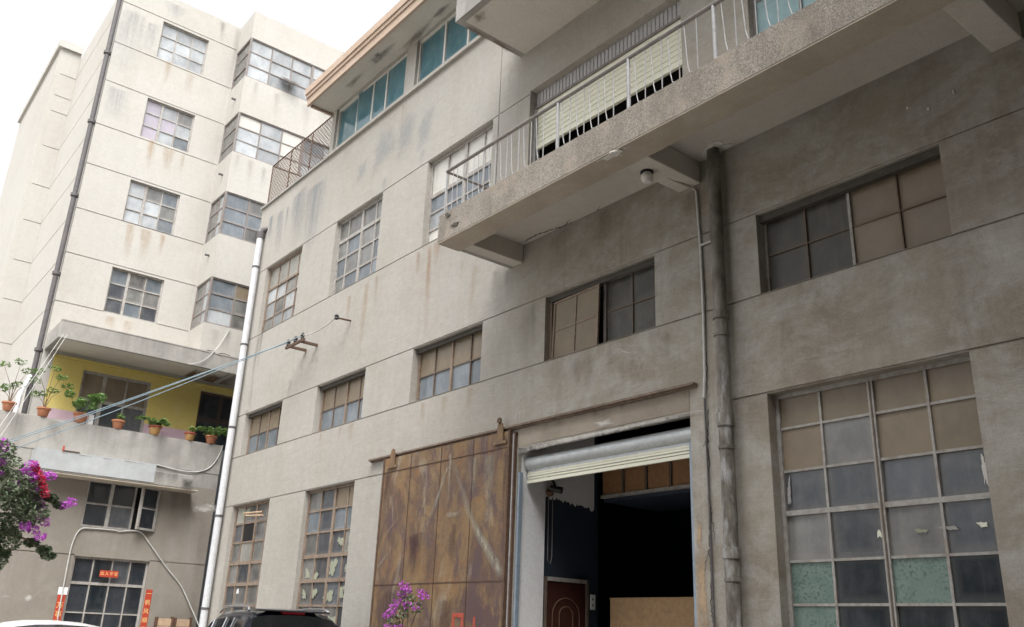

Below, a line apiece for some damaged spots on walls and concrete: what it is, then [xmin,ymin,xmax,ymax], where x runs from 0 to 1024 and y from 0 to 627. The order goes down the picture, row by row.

crack [524,209,599,242]